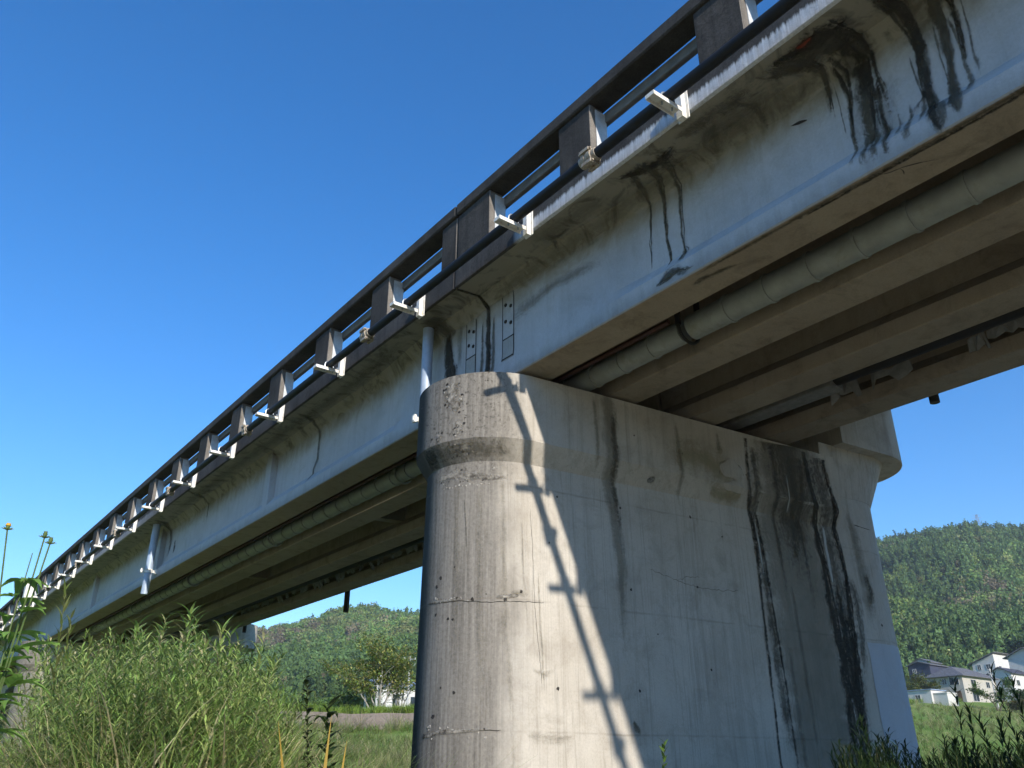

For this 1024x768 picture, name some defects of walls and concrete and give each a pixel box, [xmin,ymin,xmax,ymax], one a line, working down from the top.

water stain [621,150,690,285]
water stain [699,0,1024,282]
crack [431,511,544,677]
water stain [744,438,798,768]
water stain [768,444,873,768]